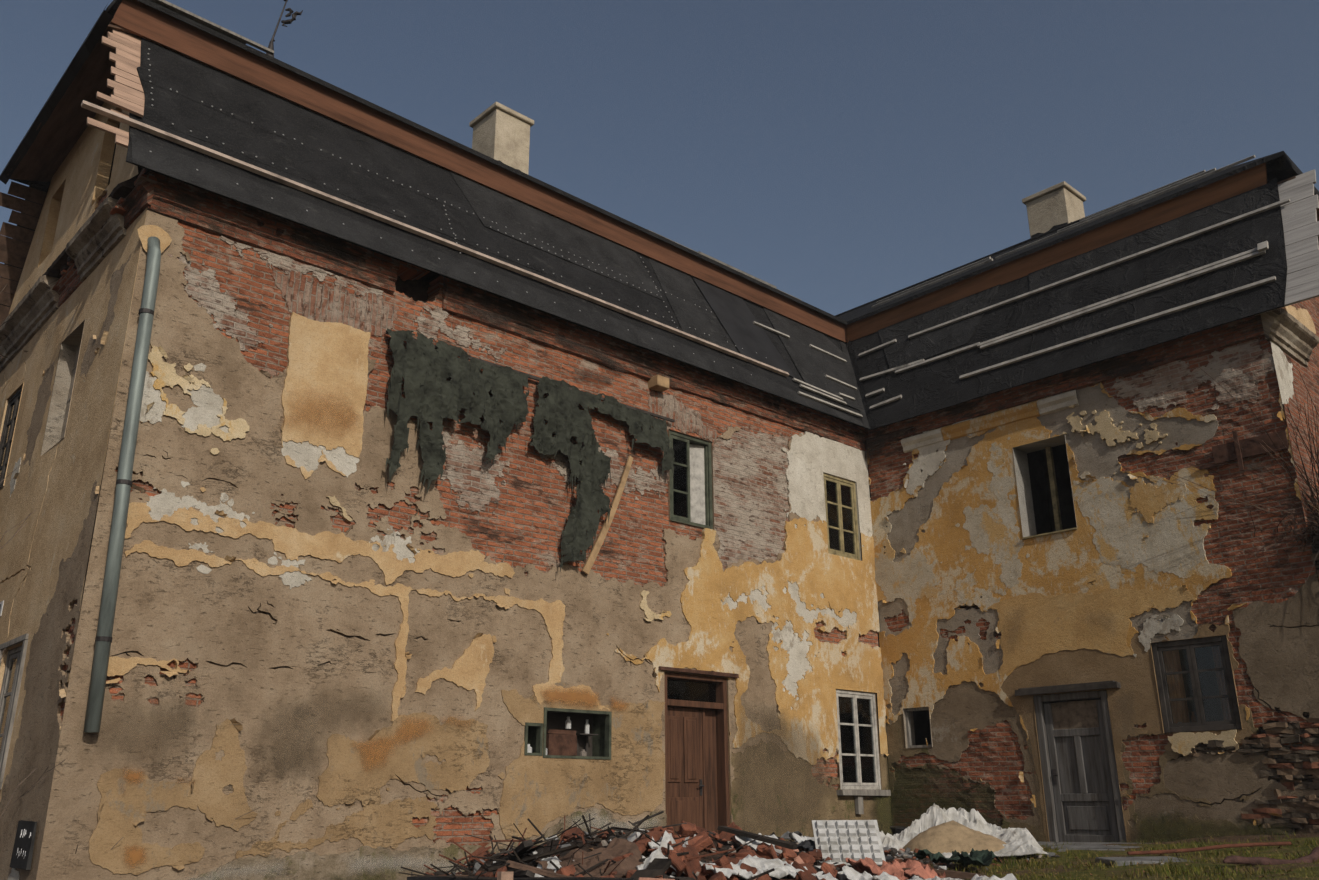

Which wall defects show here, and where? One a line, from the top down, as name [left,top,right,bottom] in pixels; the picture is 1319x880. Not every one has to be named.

spalling [80,253,132,377]
spalling [10,361,55,497]
flaking render [106,222,1319,859]
spalling [0,480,99,880]
peeling [88,718,257,875]